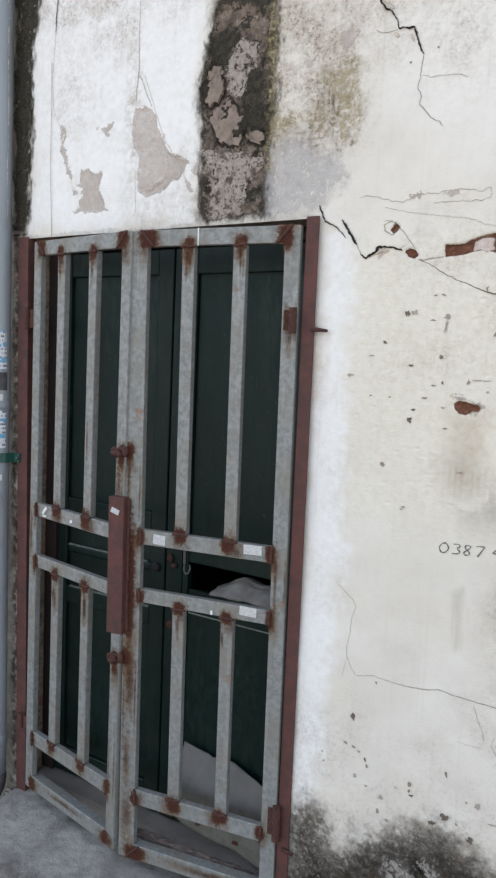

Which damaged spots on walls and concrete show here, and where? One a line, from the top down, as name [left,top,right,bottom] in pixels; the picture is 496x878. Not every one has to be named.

flaking render [132,0,270,222]
leakage [197,0,281,224]
crack [377,0,465,126]
crack [319,187,496,295]
flaking render [445,233,496,257]
leakage [11,0,42,780]
spalling [451,393,485,415]
rust [117,442,140,501]
rust [111,513,144,726]
crack [336,583,496,765]
rust [125,844,145,861]
leakage [287,808,493,878]